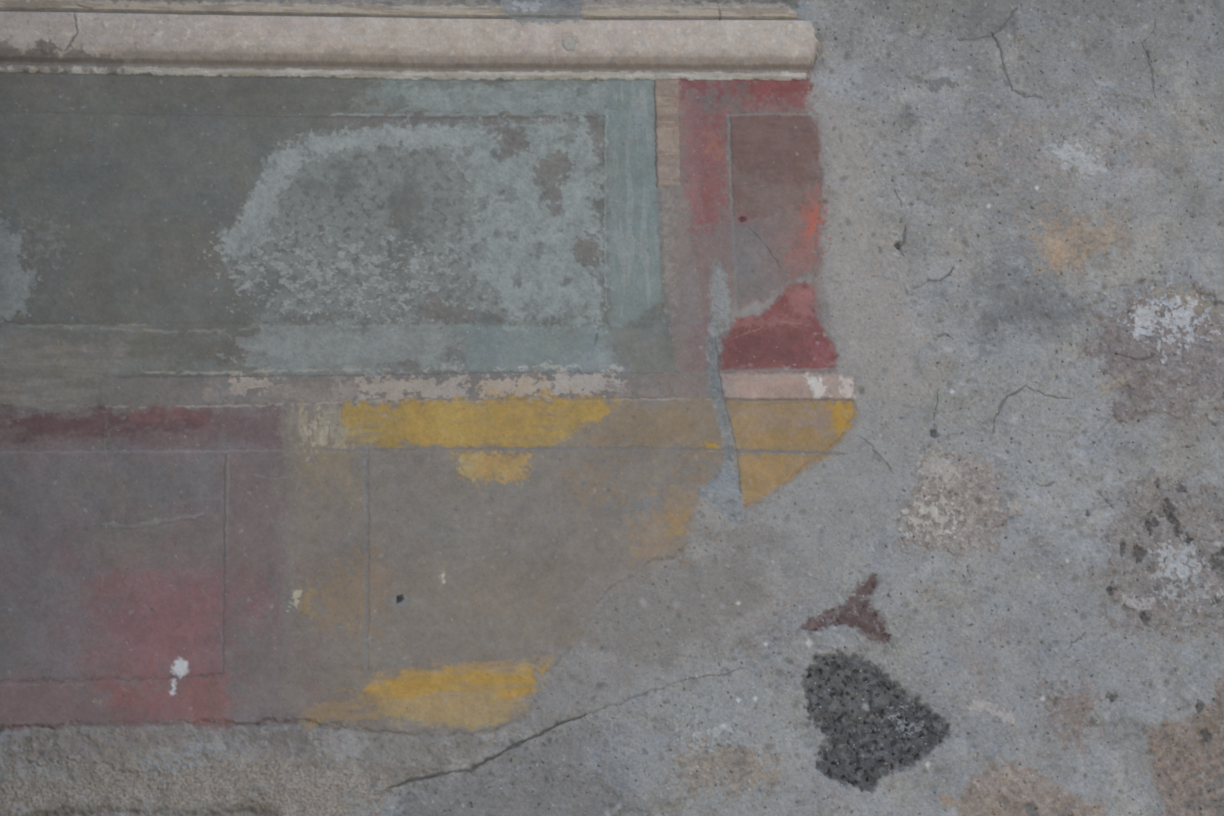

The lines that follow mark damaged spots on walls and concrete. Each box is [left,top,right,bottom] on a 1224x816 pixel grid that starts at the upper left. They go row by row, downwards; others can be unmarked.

crack [956,12,1048,101]
flaking render [0,725,503,816]
crack [387,667,746,790]